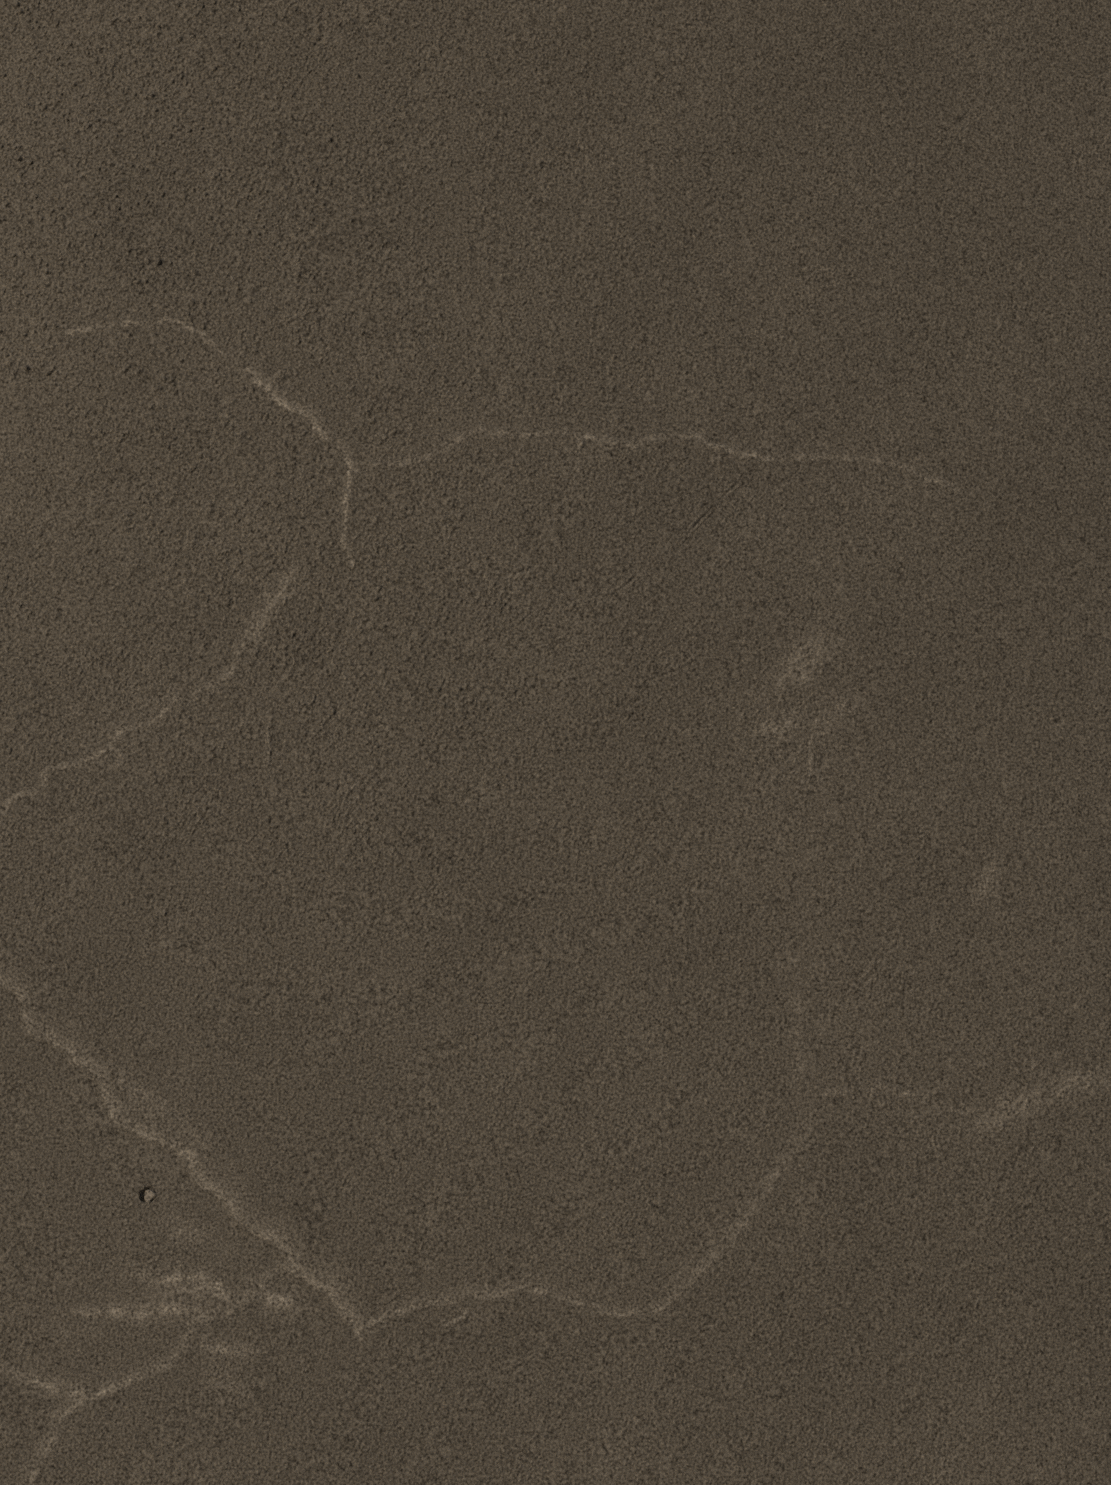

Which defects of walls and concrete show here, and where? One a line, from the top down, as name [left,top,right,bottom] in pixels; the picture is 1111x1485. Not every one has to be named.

crack [59,315,967,575]